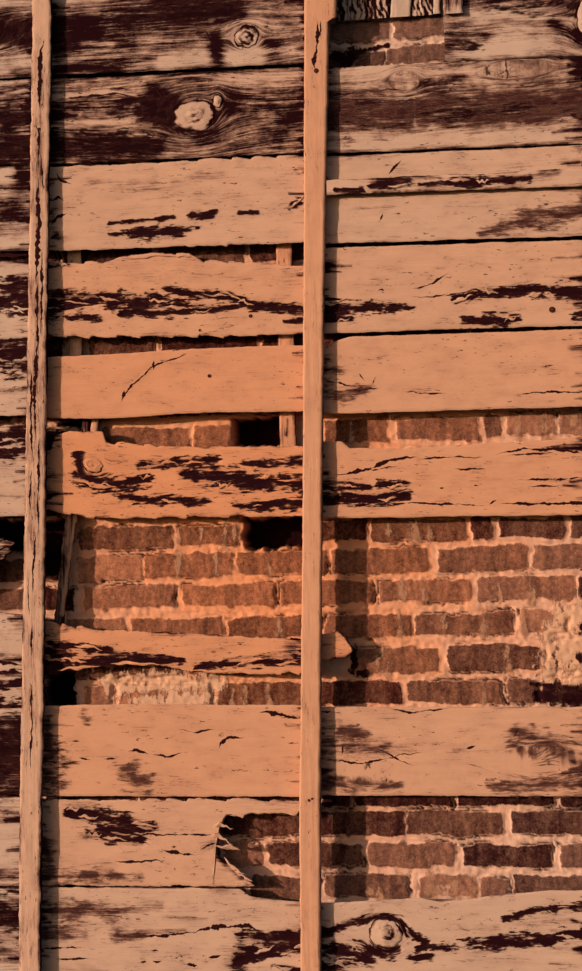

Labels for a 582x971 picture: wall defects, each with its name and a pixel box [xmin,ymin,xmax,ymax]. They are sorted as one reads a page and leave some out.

peeling [333,186,365,194]
peeling [389,174,533,189]
crack [0,45,173,666]
crack [121,354,185,401]
peeling [74,478,118,489]
peeling [138,460,203,480]
peeling [45,644,102,663]
peeling [188,658,262,673]
spalling [348,646,369,678]
spalling [531,597,582,686]
crack [27,689,35,766]
spalling [210,832,256,887]